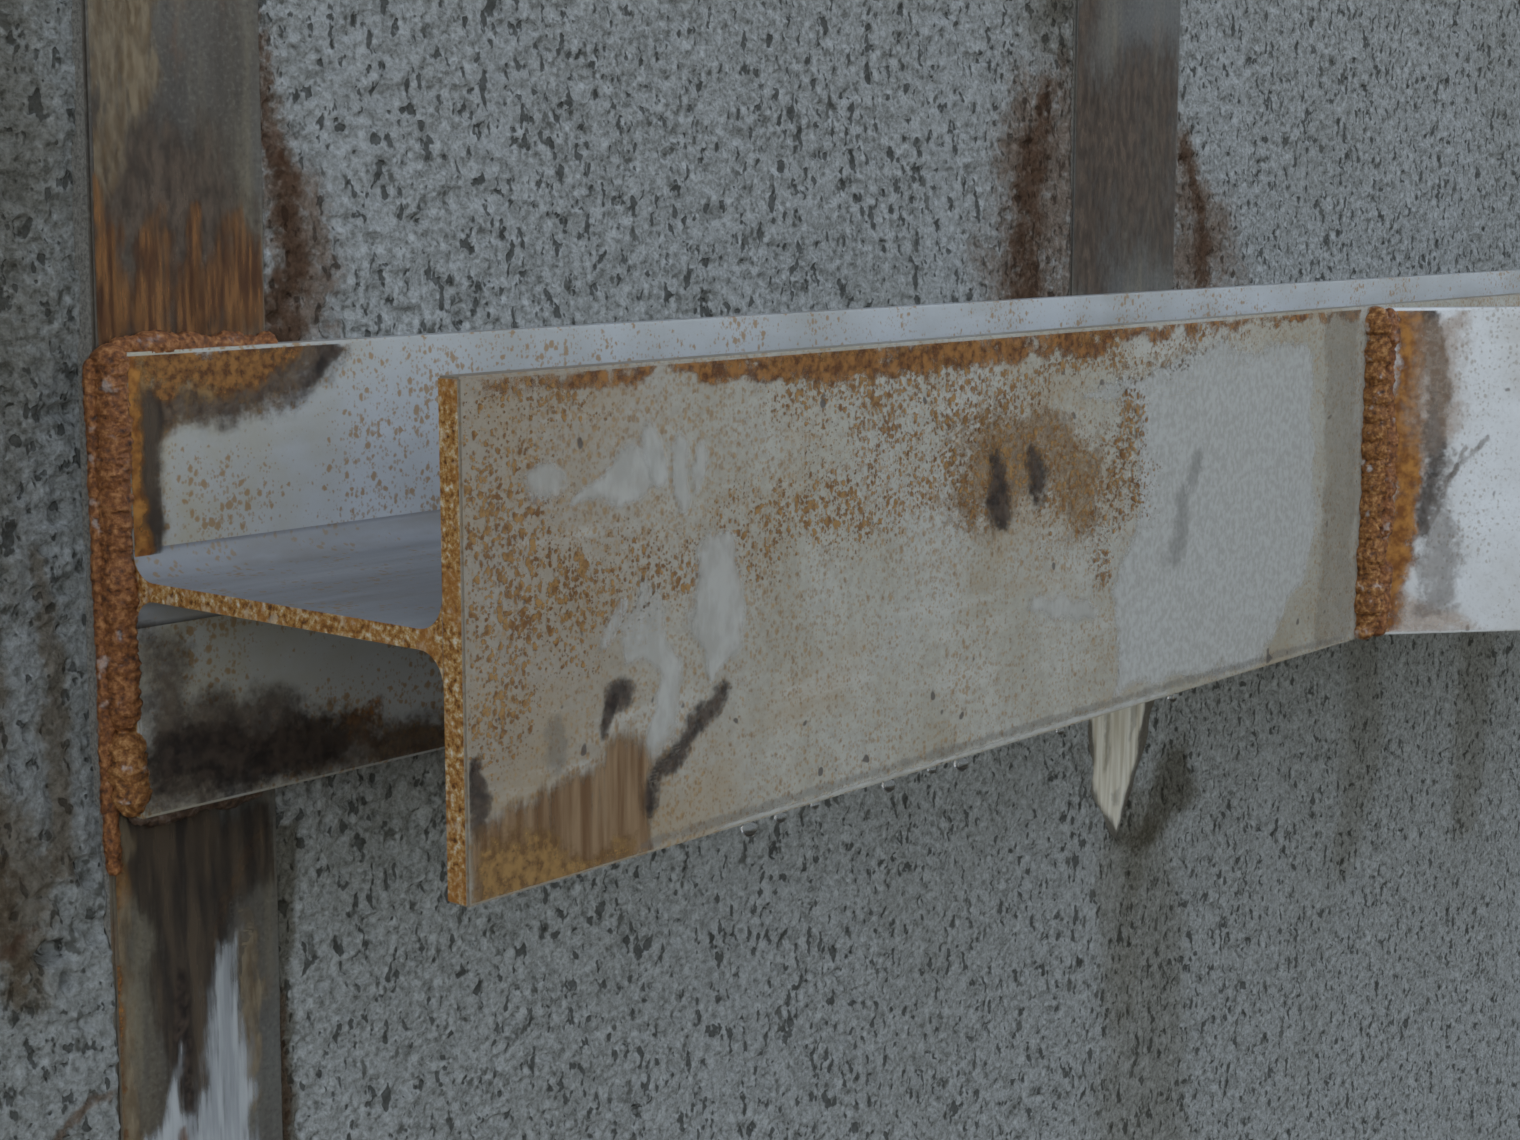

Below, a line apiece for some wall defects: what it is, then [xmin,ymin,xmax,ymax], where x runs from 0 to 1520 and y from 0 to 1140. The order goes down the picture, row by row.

rust [93,179,344,557]
rust [143,634,445,811]
rust [473,735,652,902]
rust [463,310,1361,780]